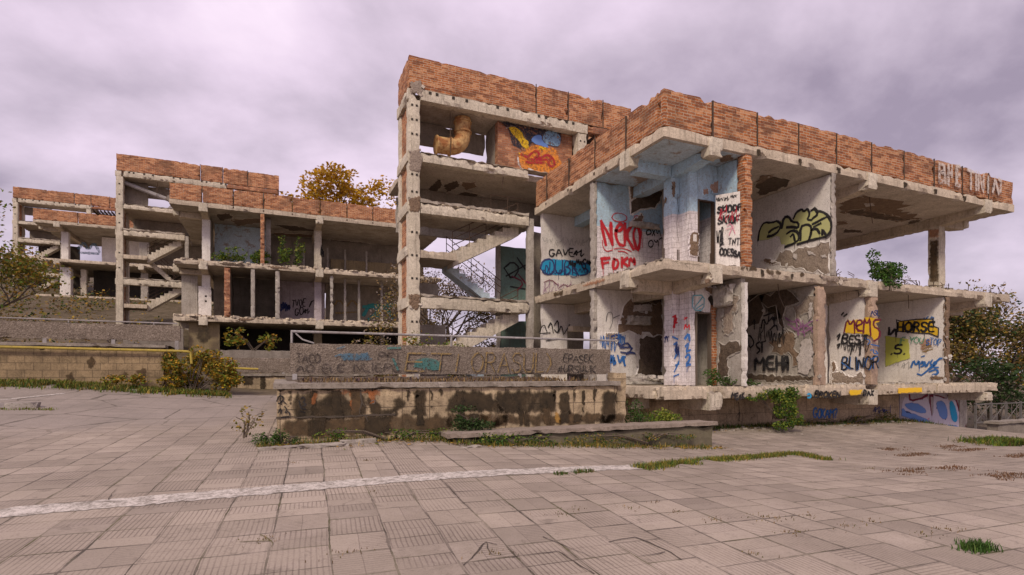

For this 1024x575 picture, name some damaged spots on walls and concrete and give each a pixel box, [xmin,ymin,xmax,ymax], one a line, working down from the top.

spalling [628,176,677,228]
spalling [754,175,792,196]
spalling [836,194,923,234]
flaking render [761,240,851,285]
flaking render [604,296,663,378]
flaking render [717,289,866,385]
damp [278,389,624,439]